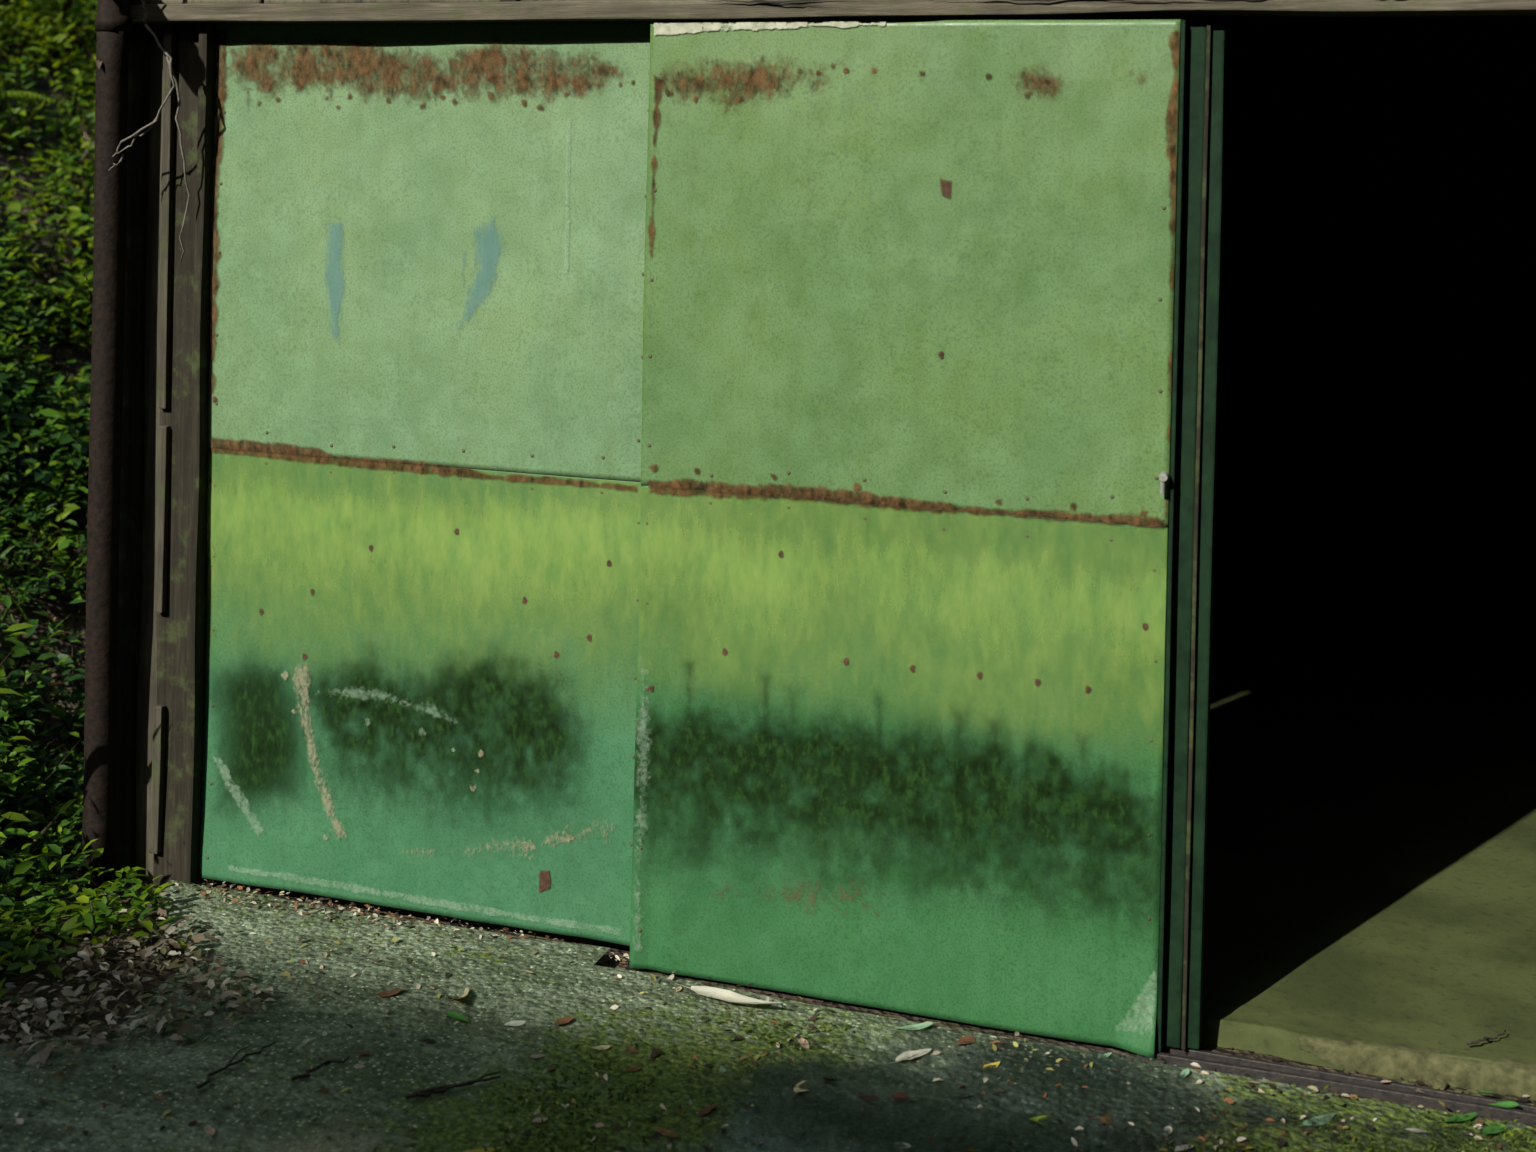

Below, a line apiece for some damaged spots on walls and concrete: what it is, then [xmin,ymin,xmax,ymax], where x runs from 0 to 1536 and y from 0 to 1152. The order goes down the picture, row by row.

corrosion [209,31,634,402]
corrosion [648,63,849,256]
corrosion [1022,72,1058,98]
corrosion [1166,31,1180,288]
corrosion [211,438,1168,528]
peeling [282,666,343,839]
leakage [221,662,577,798]
leakage [634,711,1161,902]